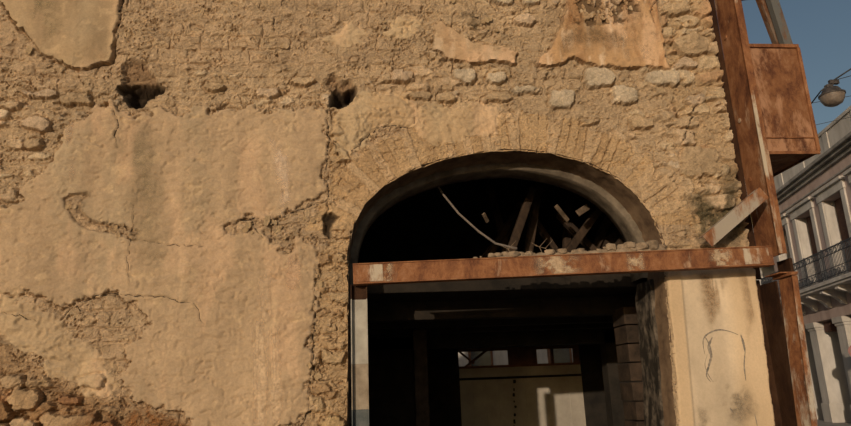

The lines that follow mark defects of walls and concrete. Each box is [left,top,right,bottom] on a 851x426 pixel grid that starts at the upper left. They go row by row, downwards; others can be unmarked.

crack [115,0,129,57]
flaking render [0,0,644,110]
flaking render [63,192,141,241]
flaking render [225,201,350,426]
flaking render [0,340,192,426]